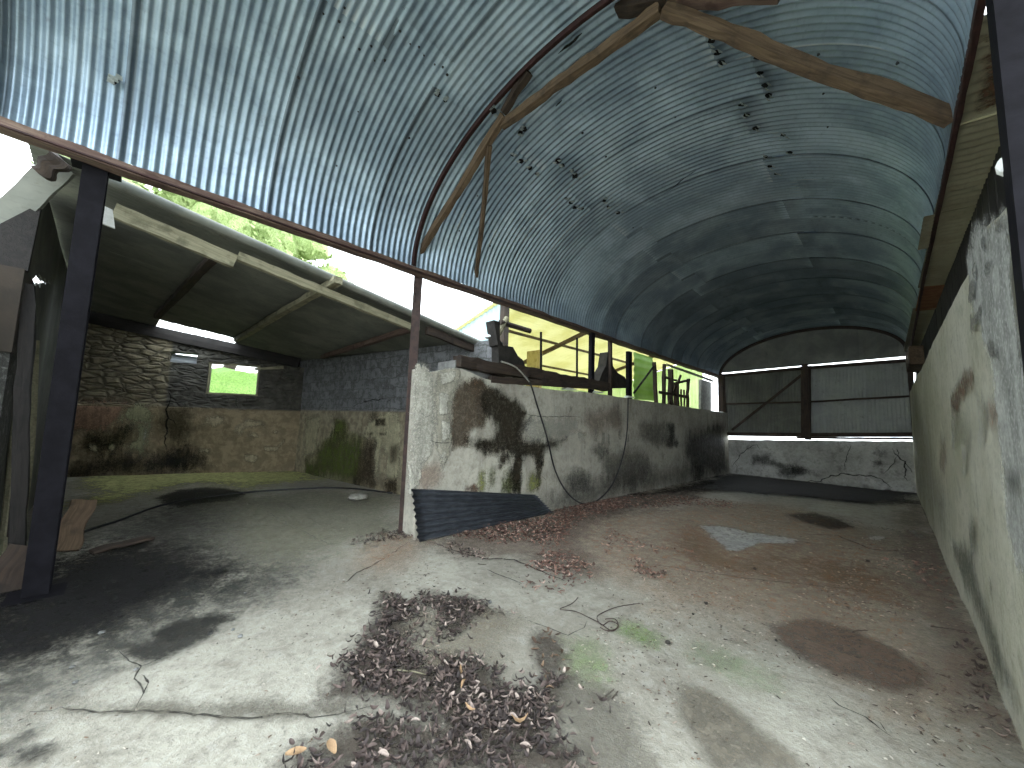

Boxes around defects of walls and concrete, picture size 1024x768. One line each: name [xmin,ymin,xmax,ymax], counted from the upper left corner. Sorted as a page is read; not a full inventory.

water stain [67,444,207,477]
crack [164,392,181,446]
water stain [353,439,397,493]
water stain [450,379,563,494]
water stain [633,425,919,505]
crack [808,446,912,488]
rust [950,371,973,414]
water stain [790,513,852,529]
water stain [0,487,264,677]
water stain [772,619,926,689]
crack [30,650,370,719]